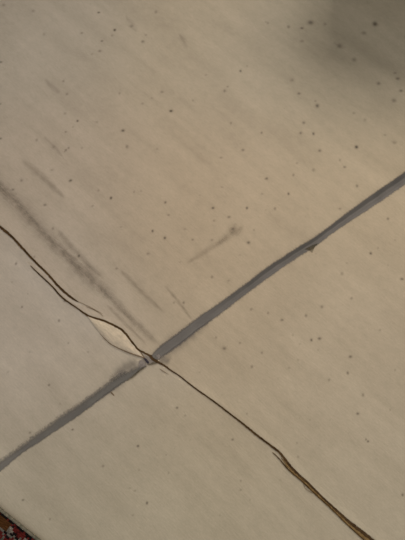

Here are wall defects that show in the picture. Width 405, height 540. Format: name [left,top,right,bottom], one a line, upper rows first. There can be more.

crack [0,220,384,540]